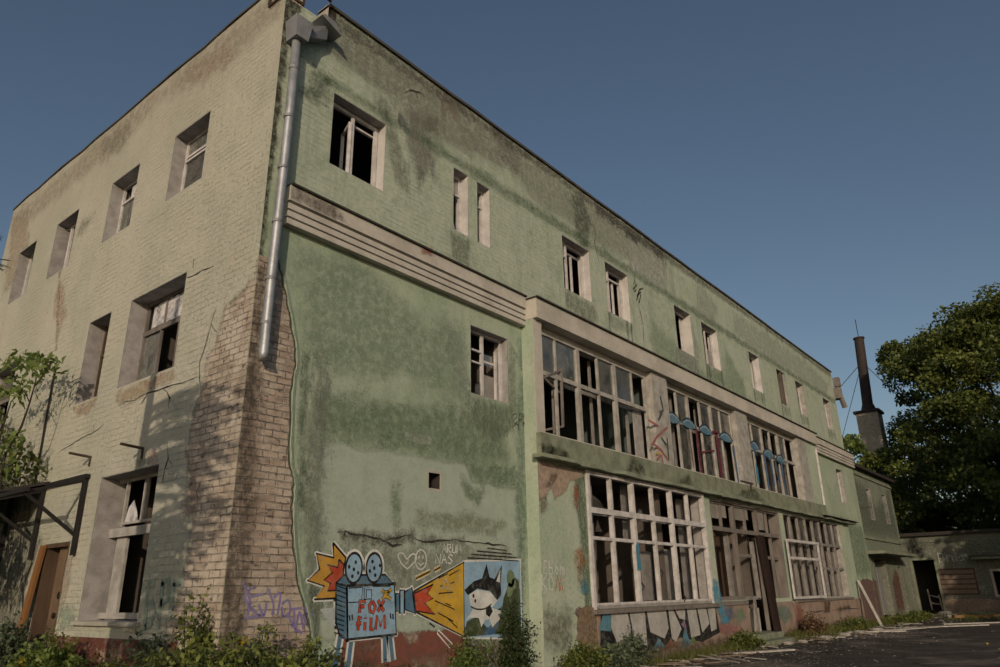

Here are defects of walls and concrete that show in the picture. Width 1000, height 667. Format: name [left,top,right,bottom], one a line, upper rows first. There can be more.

crack [120,309,217,407]
flaking render [165,254,315,667]
water stain [298,346,526,663]
crack [338,530,506,548]
peeling [537,460,584,513]
water stain [325,17,835,402]